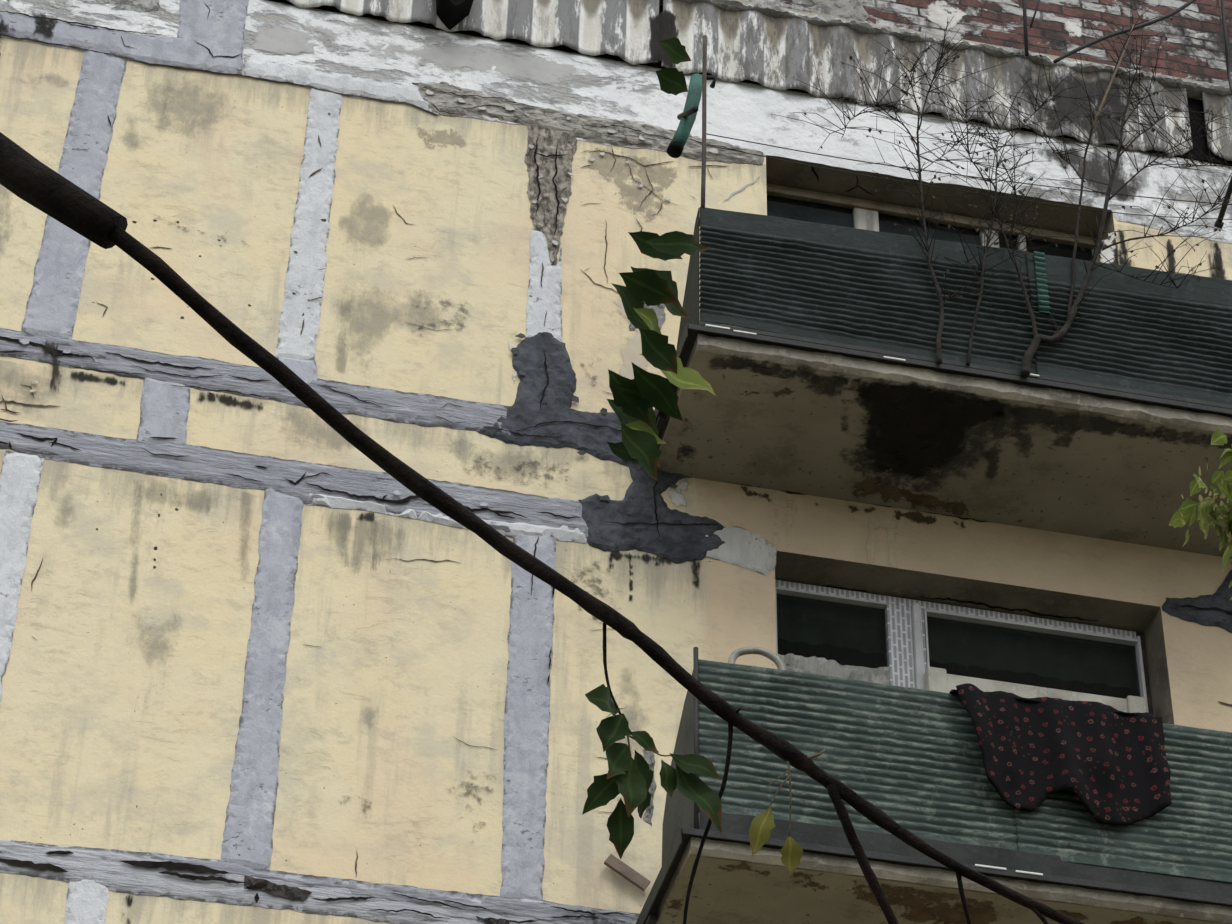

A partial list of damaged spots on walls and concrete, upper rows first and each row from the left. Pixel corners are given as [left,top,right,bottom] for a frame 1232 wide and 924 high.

spalling [96,0,161,12]
peeling [249,27,336,54]
peeling [925,1,966,31]
peeling [1064,21,1084,37]
spalling [367,42,764,265]
crack [581,146,760,231]
crack [580,203,618,293]
crack [0,336,275,399]
crack [0,380,82,451]
crack [142,437,184,457]
damp [802,371,1163,567]
crack [610,481,718,536]